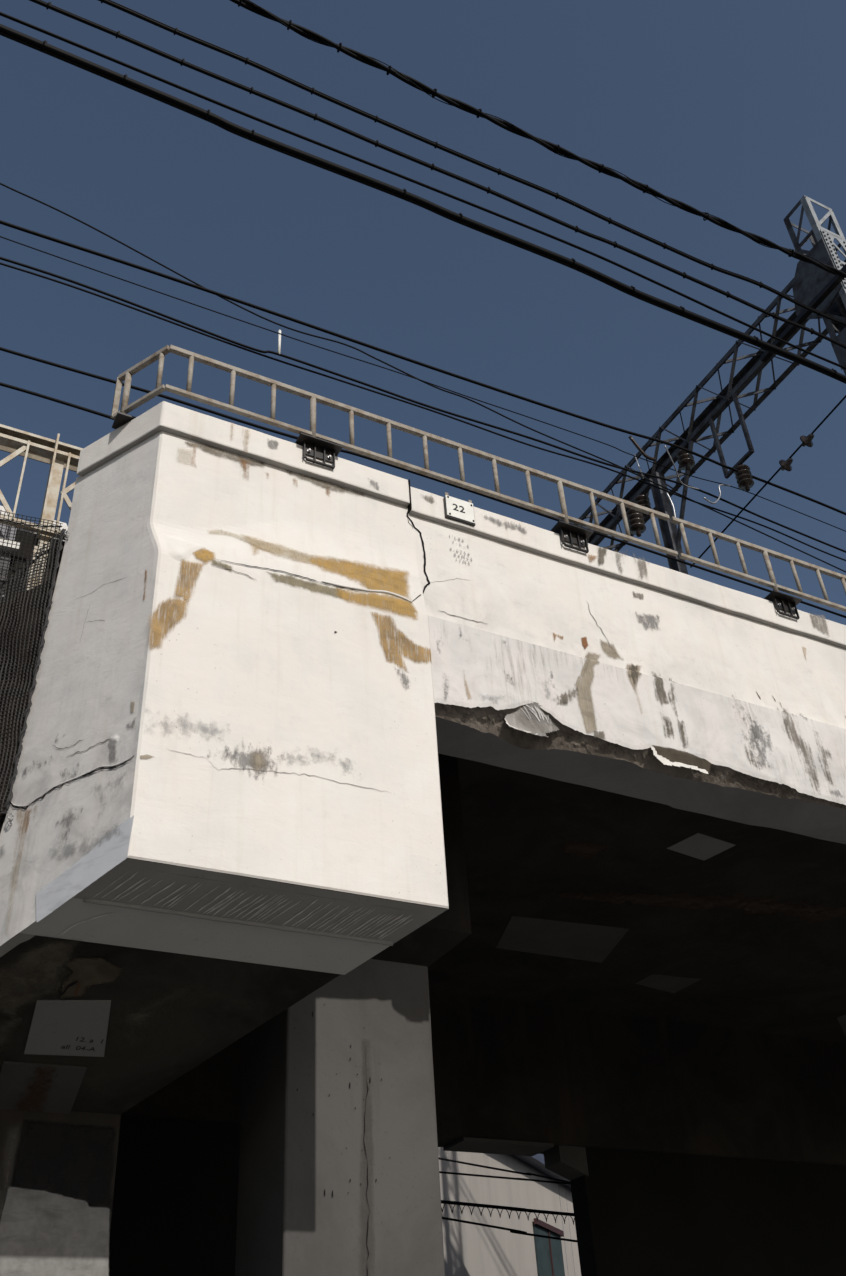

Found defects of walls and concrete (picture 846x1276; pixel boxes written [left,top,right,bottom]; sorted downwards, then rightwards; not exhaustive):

crack [215,511,487,624]
damp [560,641,686,747]
crack [10,739,135,810]
damp [225,750,274,774]
spalling [434,702,846,810]
damp [783,709,841,795]